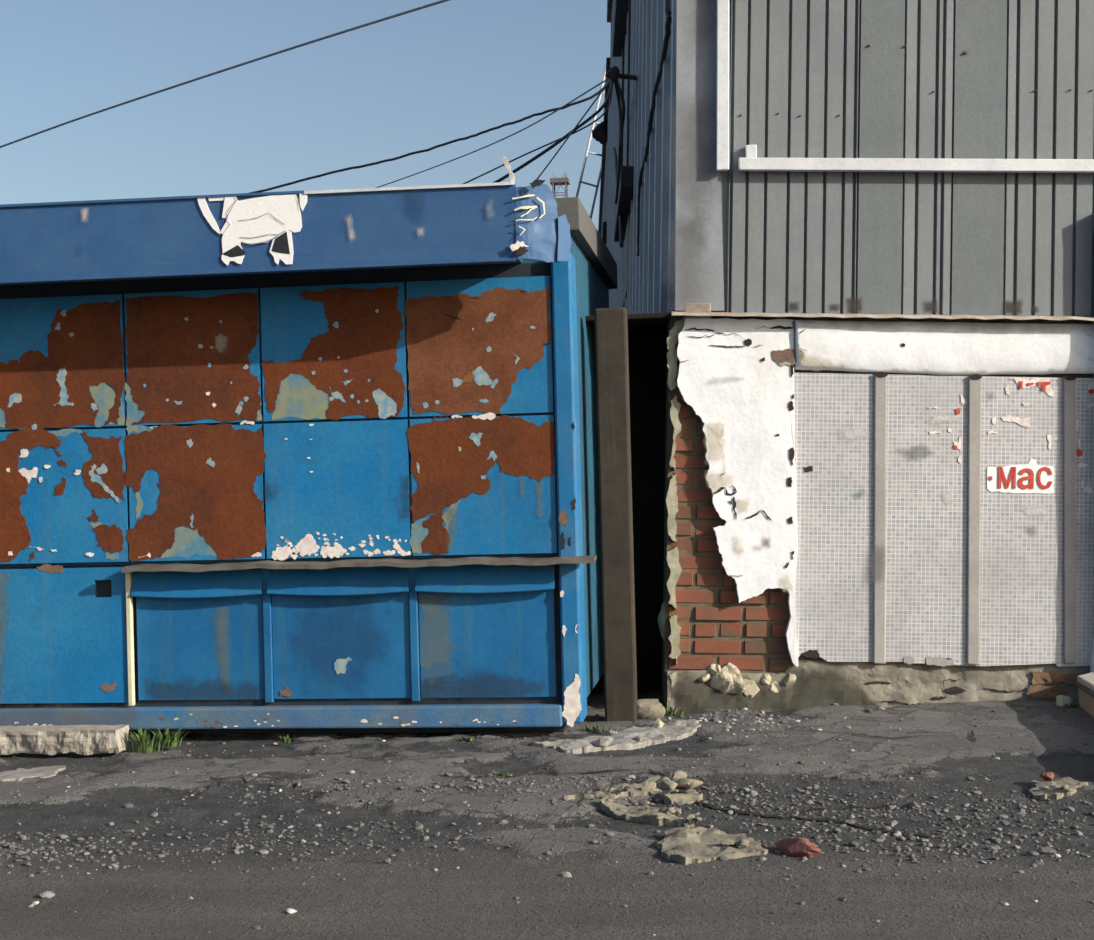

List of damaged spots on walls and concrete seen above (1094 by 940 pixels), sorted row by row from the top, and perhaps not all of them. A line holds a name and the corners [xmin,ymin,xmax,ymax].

crack [680,321,806,362]
rust [0,285,556,562]
peeling [272,532,411,561]
crack [706,425,771,520]
spalling [665,317,820,687]
peeling [562,674,582,727]